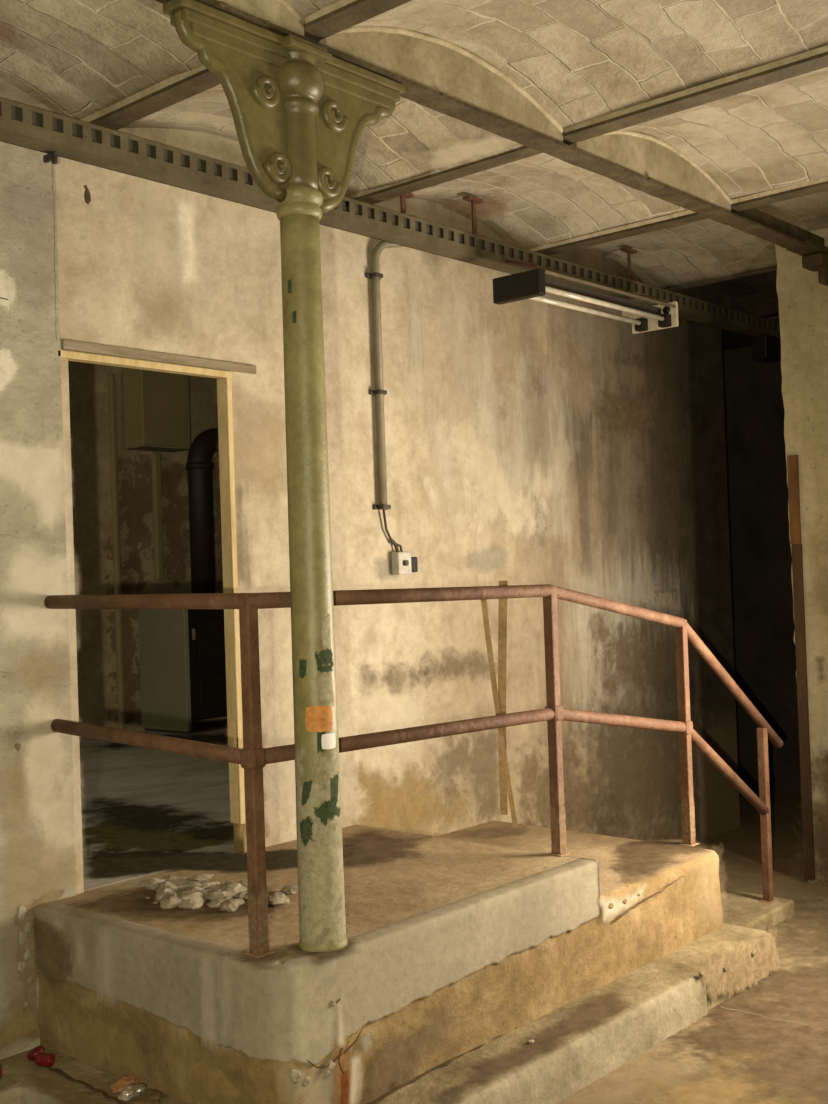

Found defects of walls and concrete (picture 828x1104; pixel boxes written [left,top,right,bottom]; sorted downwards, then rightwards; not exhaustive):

peeling [363,684,424,733]
peeling [389,741,414,751]
peeling [275,613,346,946]
spalling [601,893,640,919]
corrosion [335,1023,351,1104]